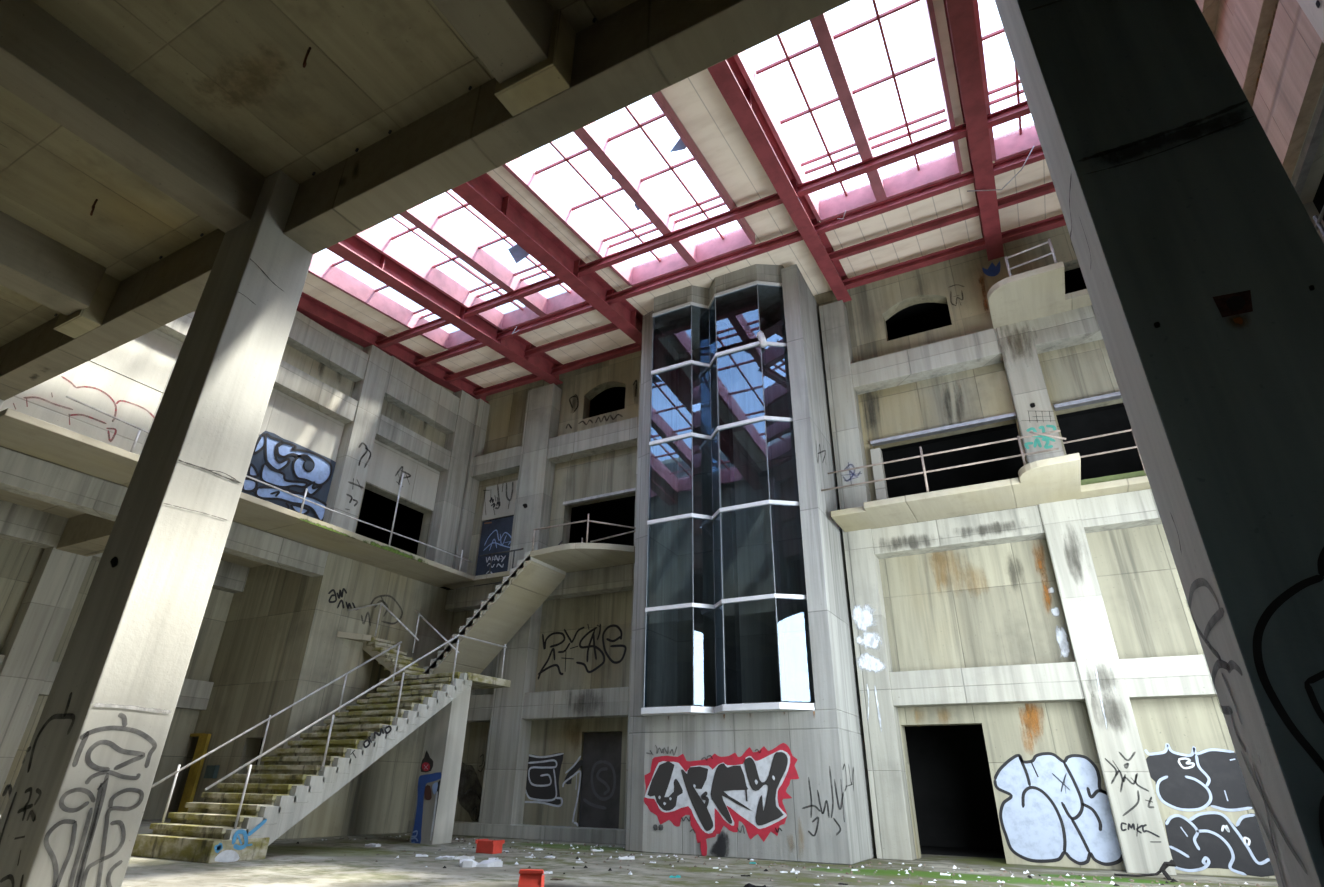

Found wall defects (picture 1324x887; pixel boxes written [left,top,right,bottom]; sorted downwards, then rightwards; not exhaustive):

rust [1023,705,1043,746]